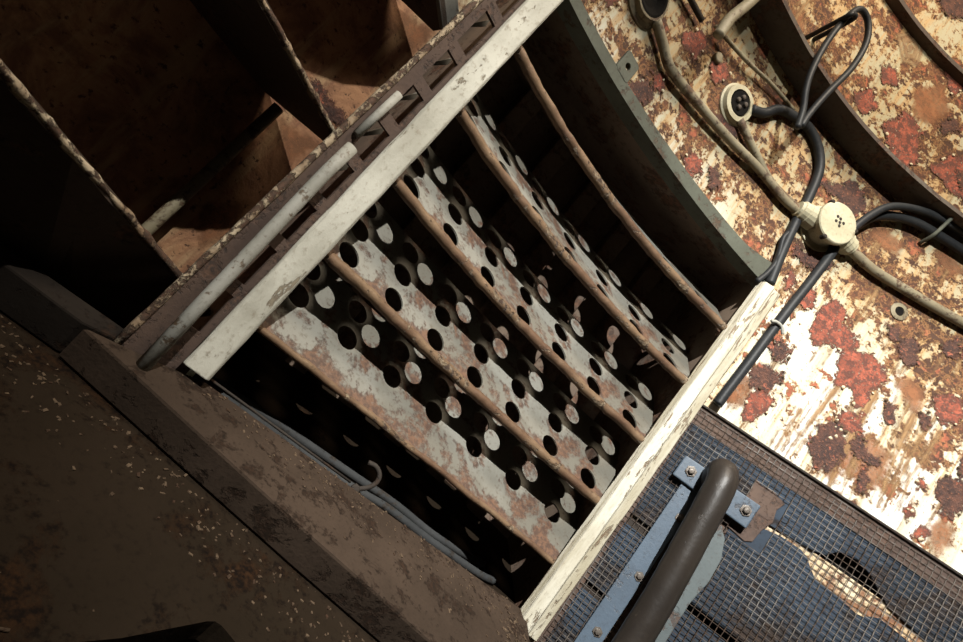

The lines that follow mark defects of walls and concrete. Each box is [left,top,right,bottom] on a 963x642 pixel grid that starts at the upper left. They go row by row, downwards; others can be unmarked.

corrosion [938,0,963,20]
corrosion [706,110,741,191]
corrosion [820,177,872,220]
peeling [780,270,799,294]
corrosion [935,251,963,277]
corrosion [728,334,795,408]
peeling [800,286,890,440]
peeling [740,388,777,427]
corrosion [771,320,942,510]
peeling [930,391,963,428]
peeling [897,476,932,541]
corrosion [923,457,963,557]